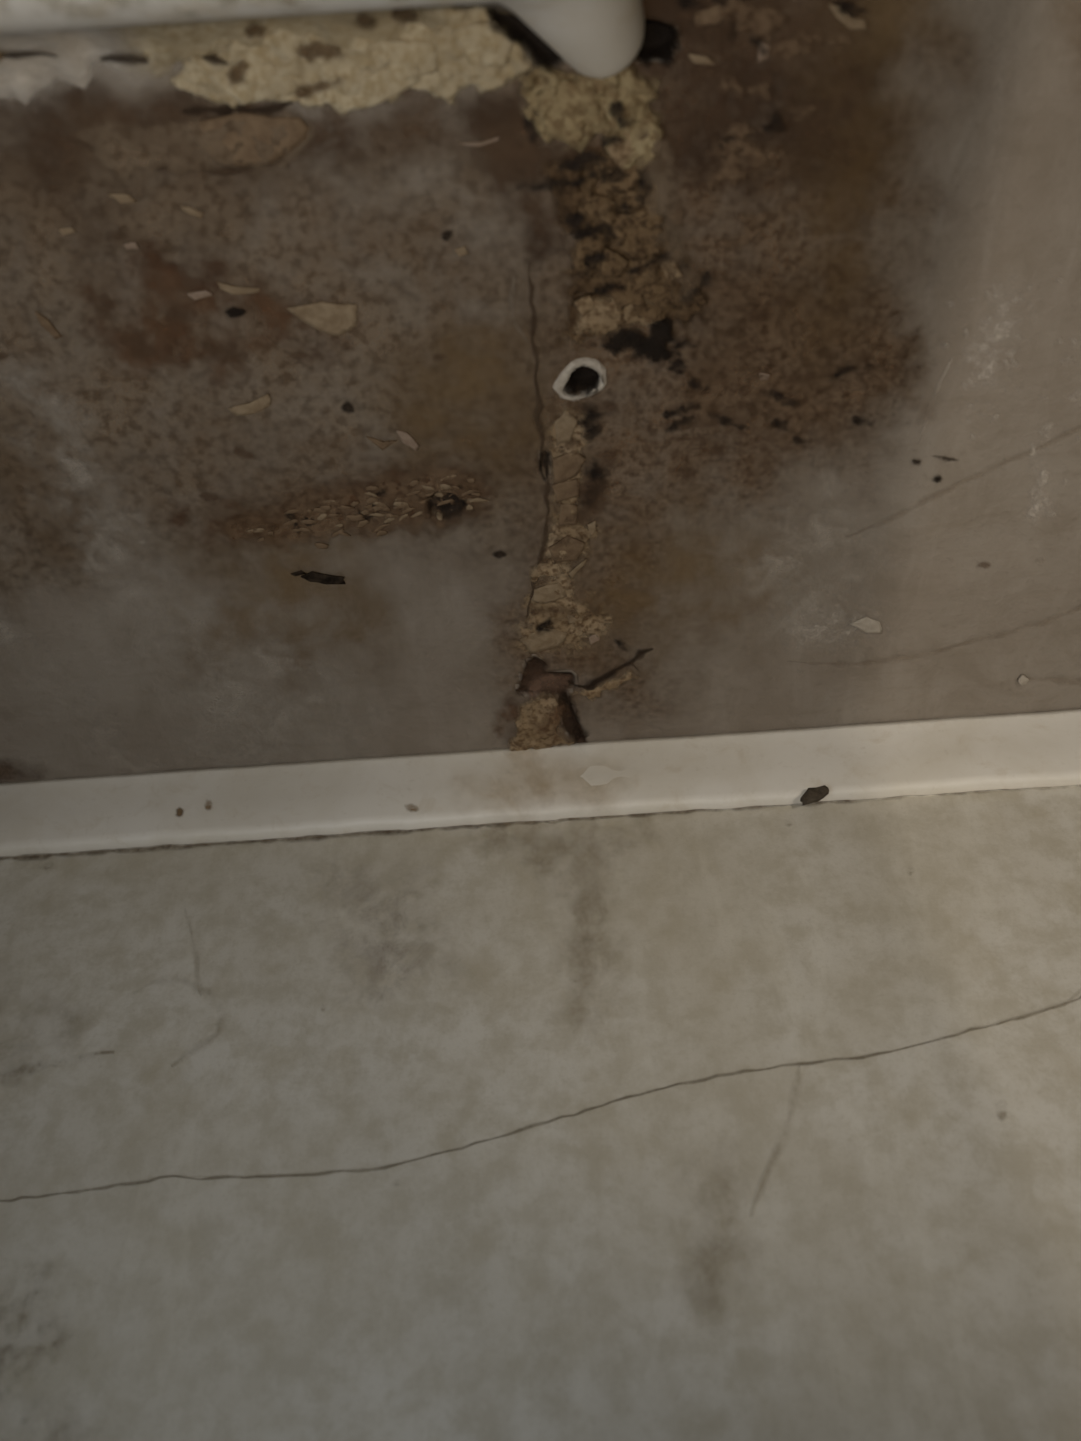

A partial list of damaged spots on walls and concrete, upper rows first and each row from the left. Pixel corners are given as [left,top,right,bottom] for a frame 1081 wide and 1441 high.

spalling [76,5,711,343]
damp [0,0,917,705]
crack [525,262,550,626]
spalling [498,391,624,751]
crack [0,997,1081,1202]